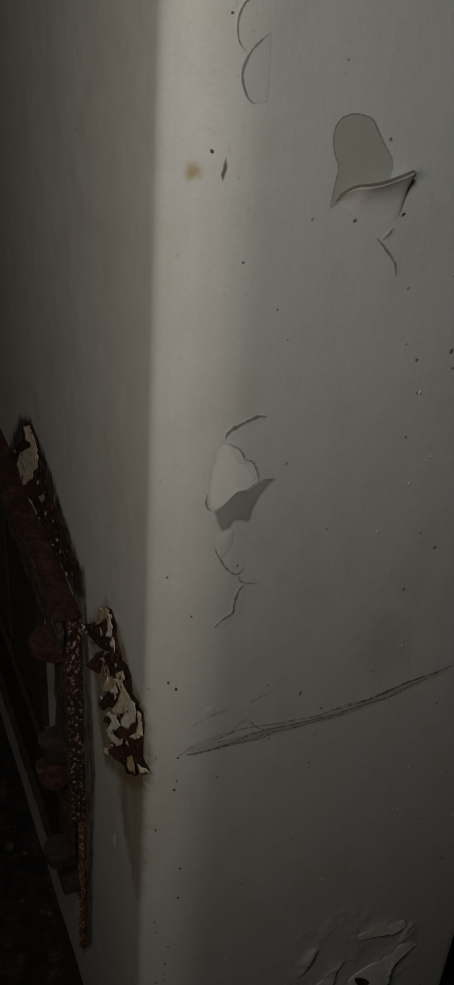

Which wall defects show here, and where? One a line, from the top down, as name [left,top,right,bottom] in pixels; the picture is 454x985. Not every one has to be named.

peeling [330,113,417,277]
peeling [205,414,273,630]
rust [10,419,157,950]